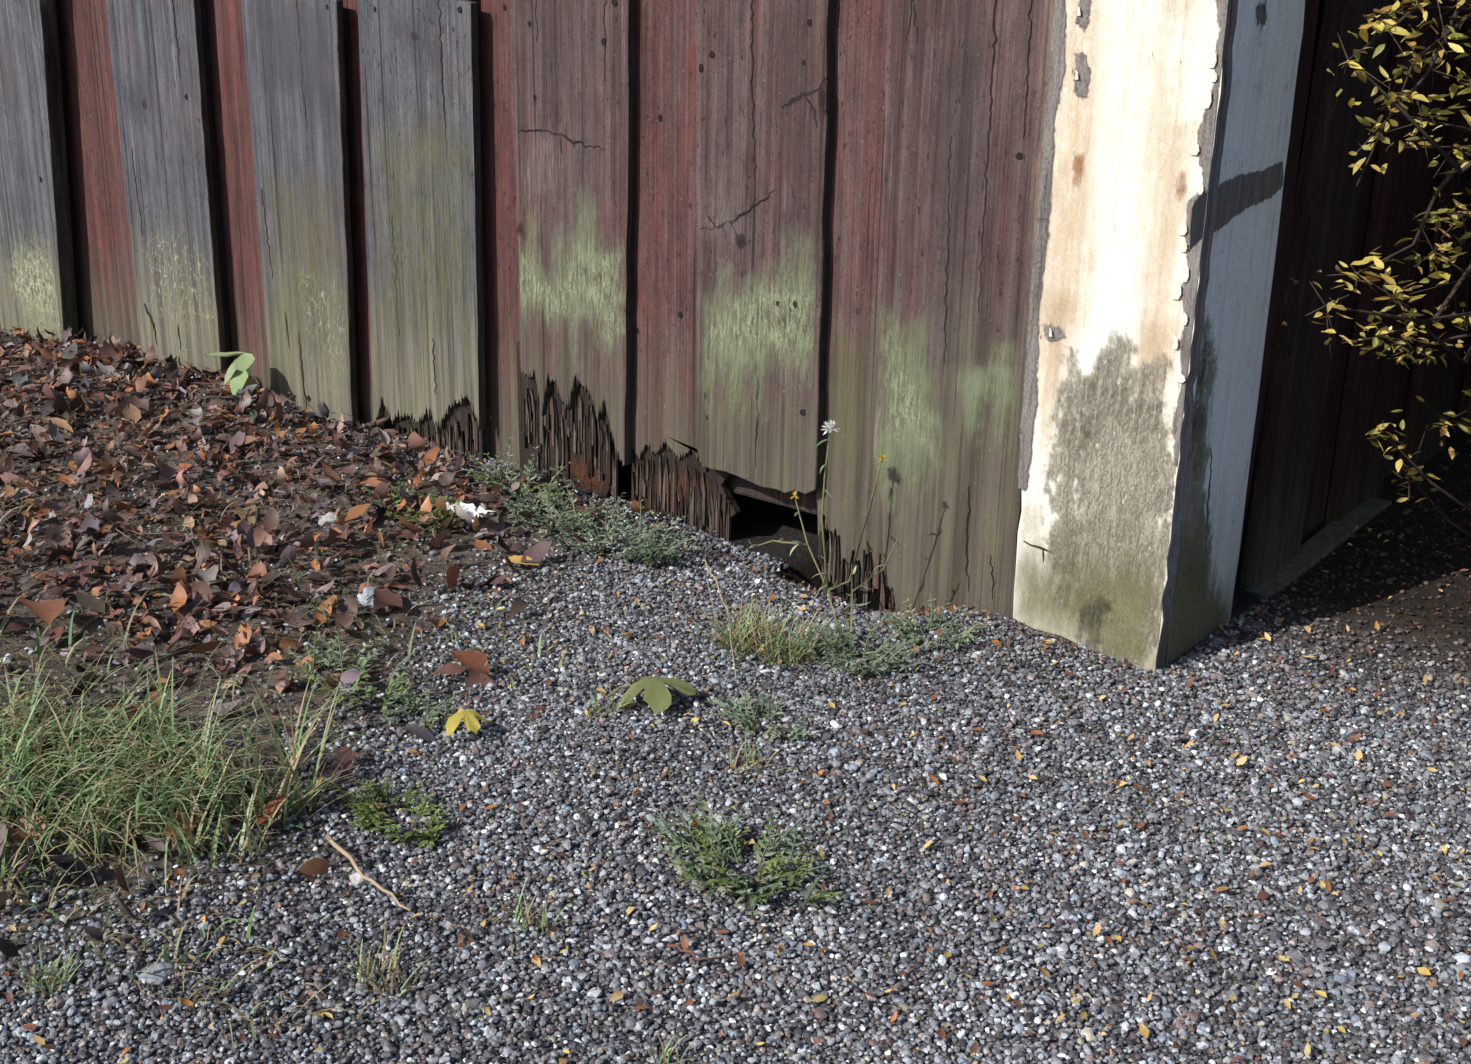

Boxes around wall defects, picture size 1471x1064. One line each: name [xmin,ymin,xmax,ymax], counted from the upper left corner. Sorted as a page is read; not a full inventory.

crack [518,129,606,154]
crack [700,0,827,244]
peeling [1017,0,1284,666]